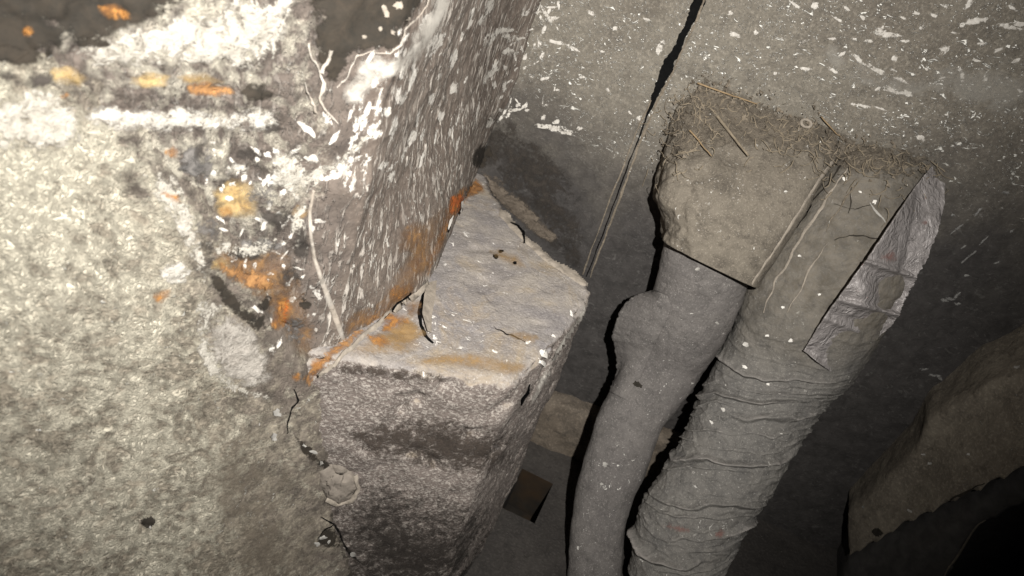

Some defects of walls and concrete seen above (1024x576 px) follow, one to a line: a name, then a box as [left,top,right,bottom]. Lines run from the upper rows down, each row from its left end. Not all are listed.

corrosion [52,69,80,83]
corrosion [139,73,165,87]
corrosion [186,78,232,95]
crack [582,0,706,277]
corrosion [216,184,251,215]
corrosion [406,181,483,275]
corrosion [214,253,293,329]
corrosion [294,286,422,385]
crack [417,292,434,343]
crack [287,390,299,434]
crack [318,517,360,562]